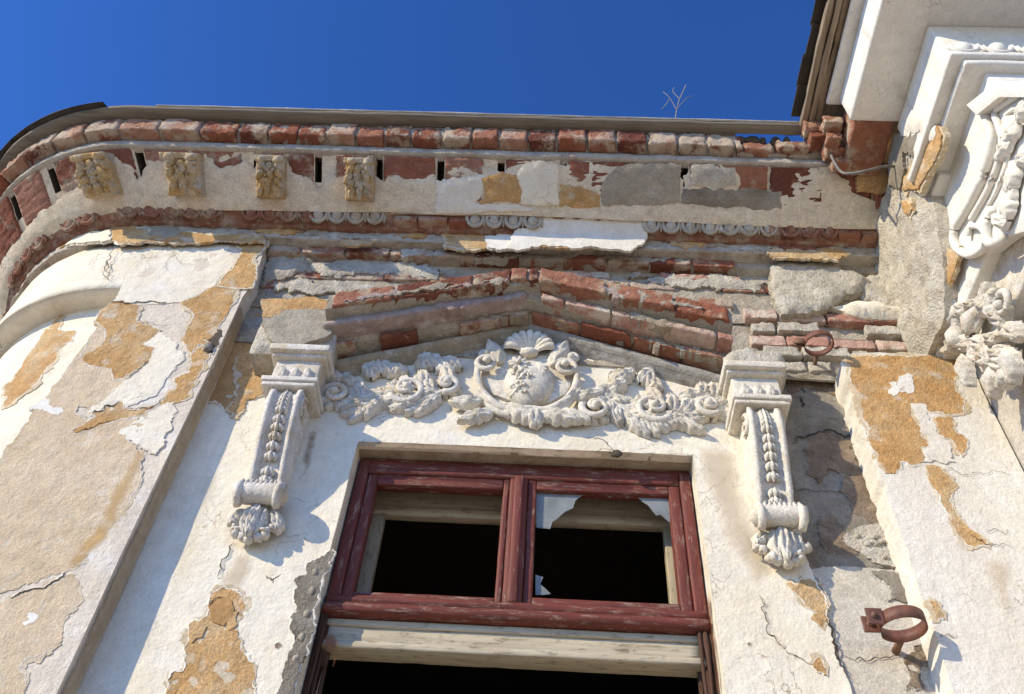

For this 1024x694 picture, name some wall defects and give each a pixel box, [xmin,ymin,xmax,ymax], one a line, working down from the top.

peeling [479,172,522,204]
peeling [558,184,600,208]
peeling [855,121,951,219]
peeling [441,234,509,253]
spalling [766,248,892,320]
spalling [786,379,836,396]
peeling [0,226,271,694]
crack [793,428,858,460]
peeling [842,352,992,551]
spalling [802,430,908,604]
spalling [274,547,337,694]
crack [760,595,810,664]